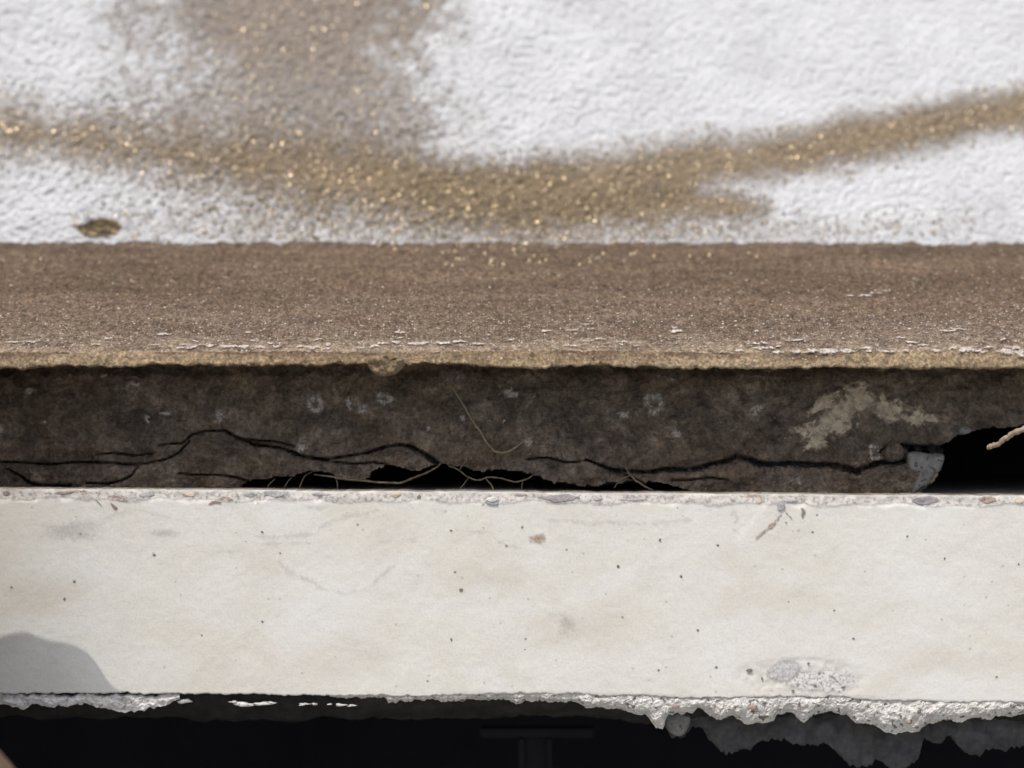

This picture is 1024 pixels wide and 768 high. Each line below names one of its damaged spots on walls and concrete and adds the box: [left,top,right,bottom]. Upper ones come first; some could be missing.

crack [6,430,438,510]
crack [539,444,945,485]
hole [907,424,1024,482]
flaking render [0,693,193,713]
spalling [299,661,1024,768]